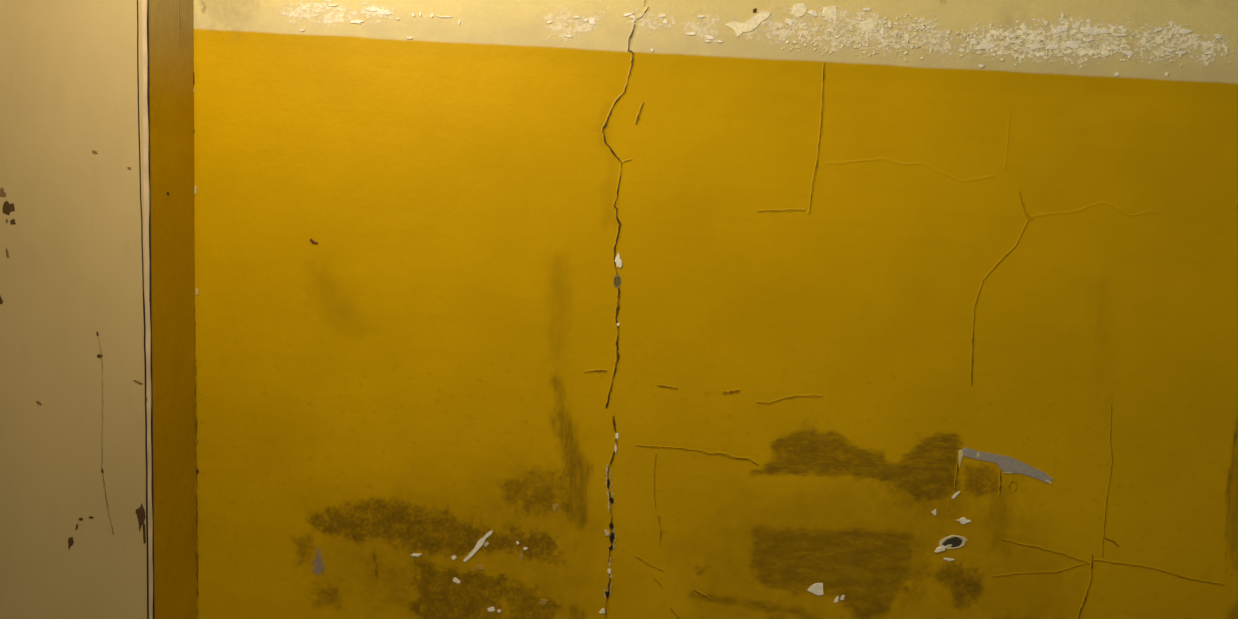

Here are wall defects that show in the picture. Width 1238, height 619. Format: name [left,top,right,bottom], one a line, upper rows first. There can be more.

crack [584,0,760,619]